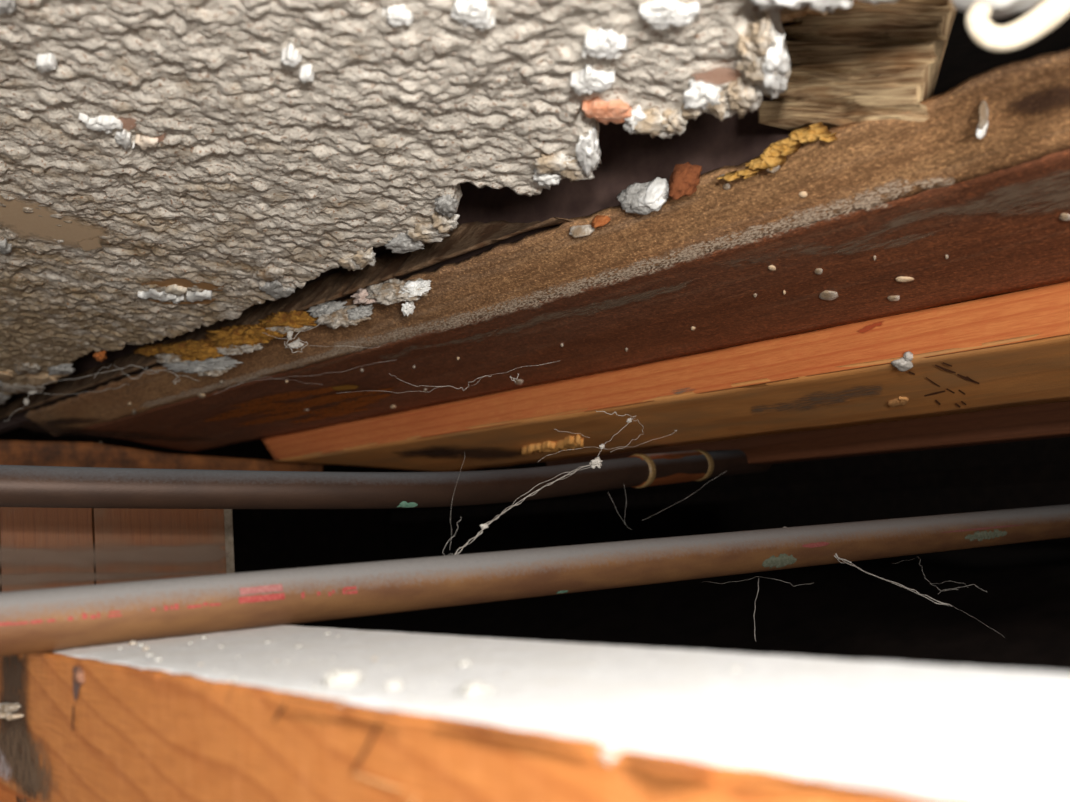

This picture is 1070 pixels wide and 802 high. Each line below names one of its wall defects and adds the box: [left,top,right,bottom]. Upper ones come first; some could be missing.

peeling [78,113,165,151]
spalling [337,194,460,271]
peeling [137,284,212,305]
peeling [253,267,295,299]
spalling [93,350,107,362]
spalling [0,362,76,404]
leakage [0,655,51,801]